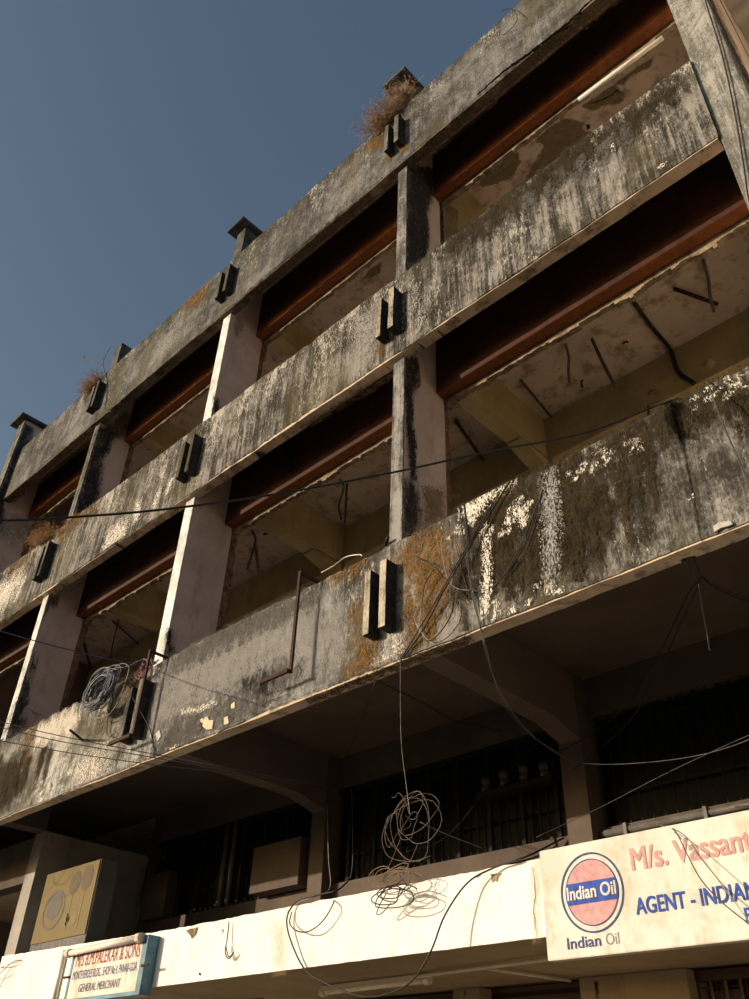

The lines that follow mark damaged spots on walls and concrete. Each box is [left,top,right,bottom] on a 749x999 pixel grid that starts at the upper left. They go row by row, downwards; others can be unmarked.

damp [707,0,749,98]
damp [405,70,695,270]
flaking render [446,215,749,411]
damp [0,422,35,545]
damp [71,424,118,516]
damp [400,356,423,538]
damp [449,363,749,631]
damp [0,566,27,613]
rust [327,558,382,679]
rust [390,486,463,653]
damp [4,654,39,734]
damp [0,746,53,815]